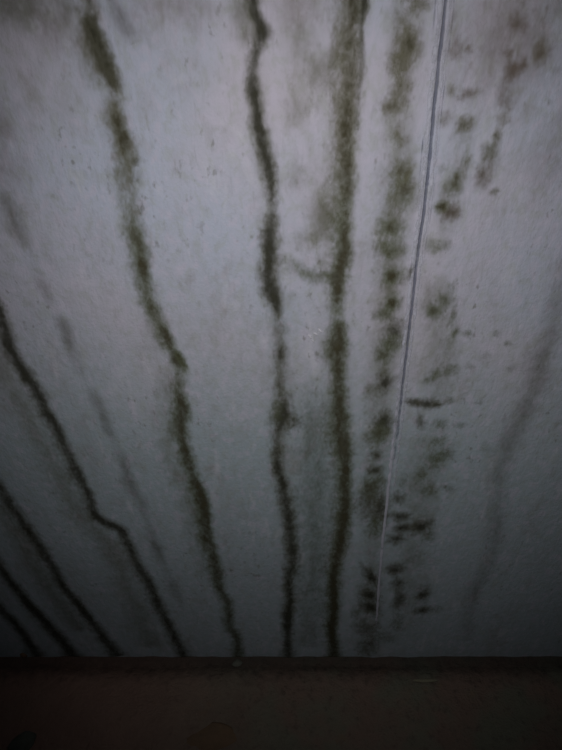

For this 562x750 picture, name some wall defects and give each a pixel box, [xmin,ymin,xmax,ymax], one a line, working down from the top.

damp [0,306,188,657]
damp [83,0,120,93]
damp [111,102,132,171]
damp [130,221,242,657]
damp [247,0,275,203]
damp [261,213,281,316]
damp [273,382,298,658]
damp [309,0,368,311]
damp [326,321,351,657]
damp [385,269,399,283]
damp [391,513,429,543]
crack [375,0,451,621]